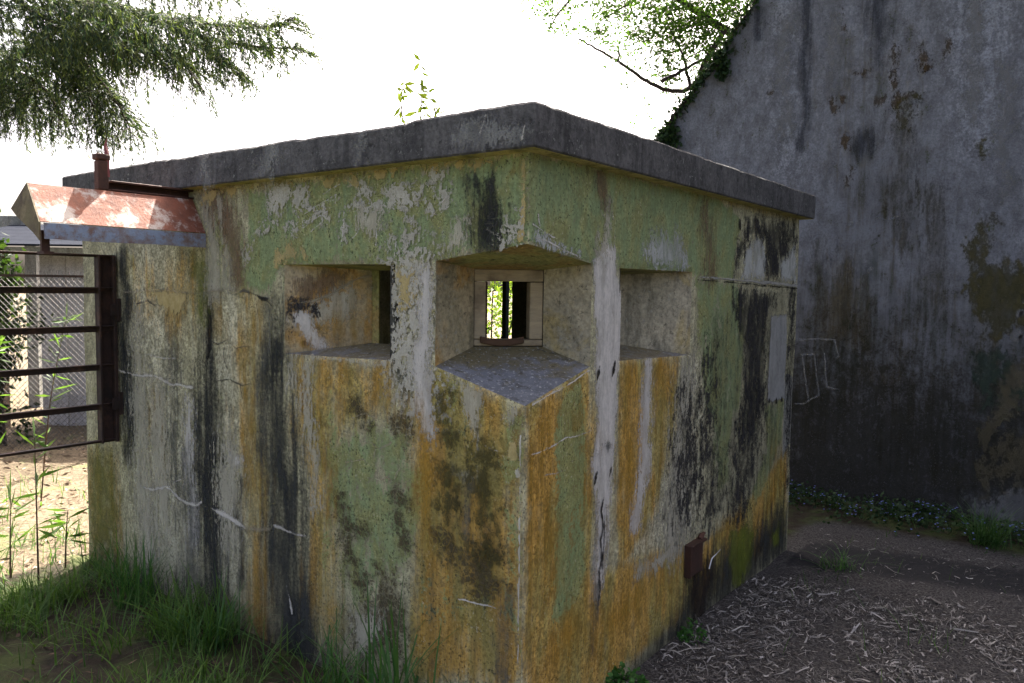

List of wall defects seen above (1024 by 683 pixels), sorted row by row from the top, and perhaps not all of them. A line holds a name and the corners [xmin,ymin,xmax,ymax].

water stain [465,173,509,252]
peeling [492,159,526,252]
water stain [532,229,581,257]
flaking render [200,159,497,460]
crack [119,355,193,389]
crack [140,478,303,536]
water stain [88,247,362,681]
water stain [431,380,508,570]
crack [596,499,609,609]
water stain [629,213,798,644]